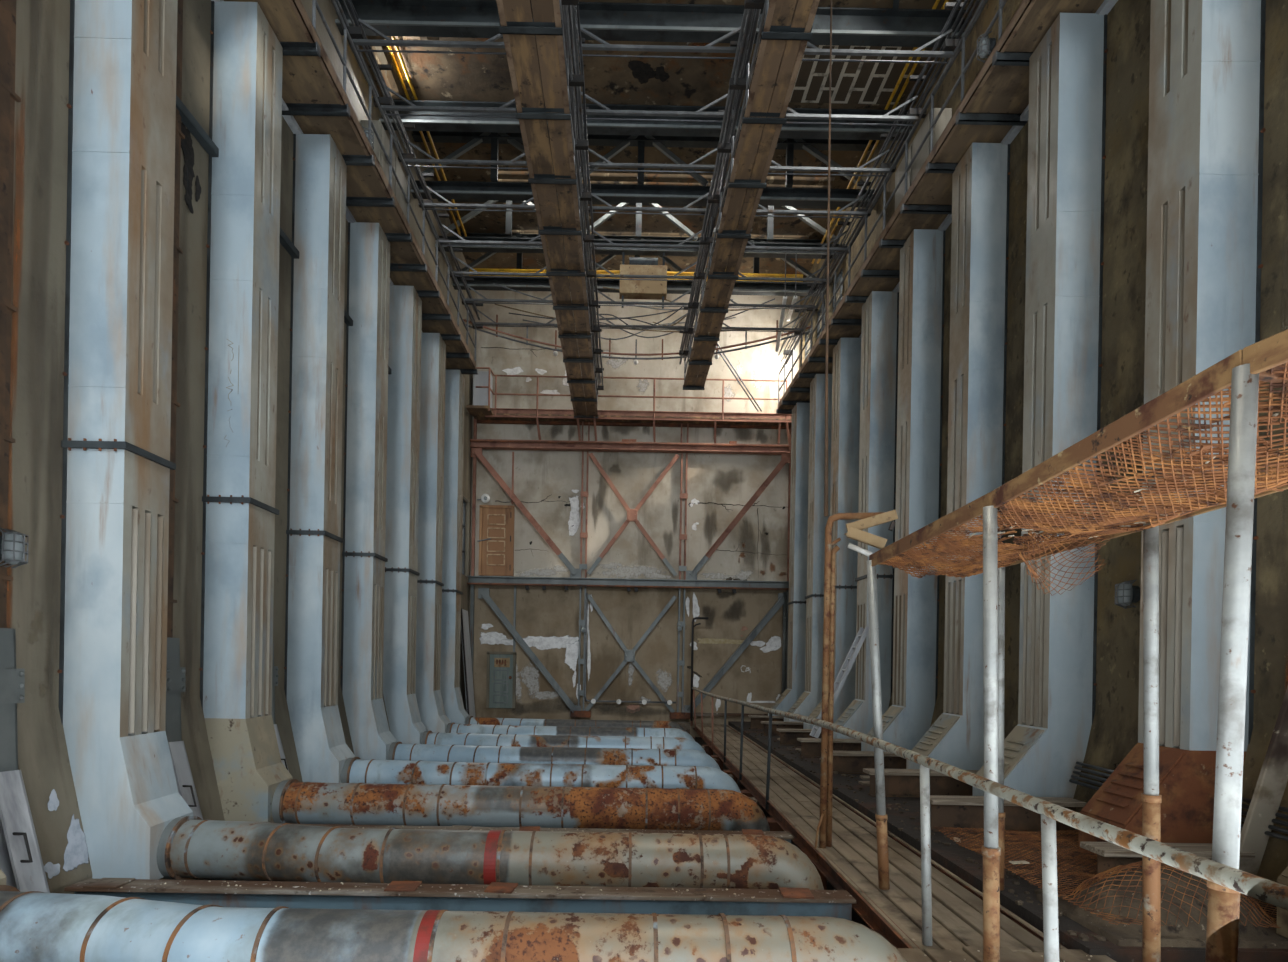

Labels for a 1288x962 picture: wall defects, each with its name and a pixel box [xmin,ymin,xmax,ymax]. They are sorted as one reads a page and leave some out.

damp [716,472,738,489]
peeling [560,490,585,536]
damp [665,506,677,547]
damp [705,517,715,538]
damp [703,526,769,625]
peeling [686,593,700,622]
peeling [479,594,593,699]
peeling [690,636,781,653]
peeling [687,666,702,688]
peeling [48,789,59,811]
peeling [44,814,89,879]